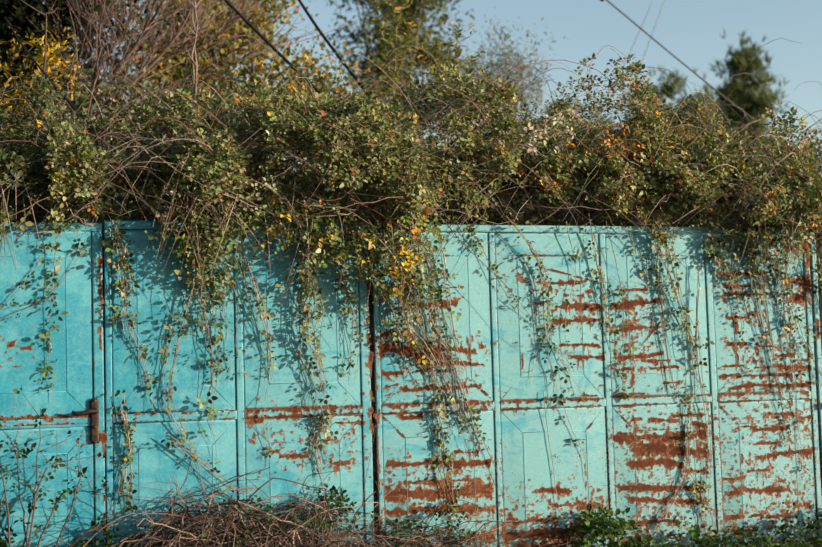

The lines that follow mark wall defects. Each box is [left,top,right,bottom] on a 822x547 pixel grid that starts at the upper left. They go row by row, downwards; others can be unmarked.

corrosion [0,335,35,368]
corrosion [113,234,818,547]
corrosion [0,414,108,534]